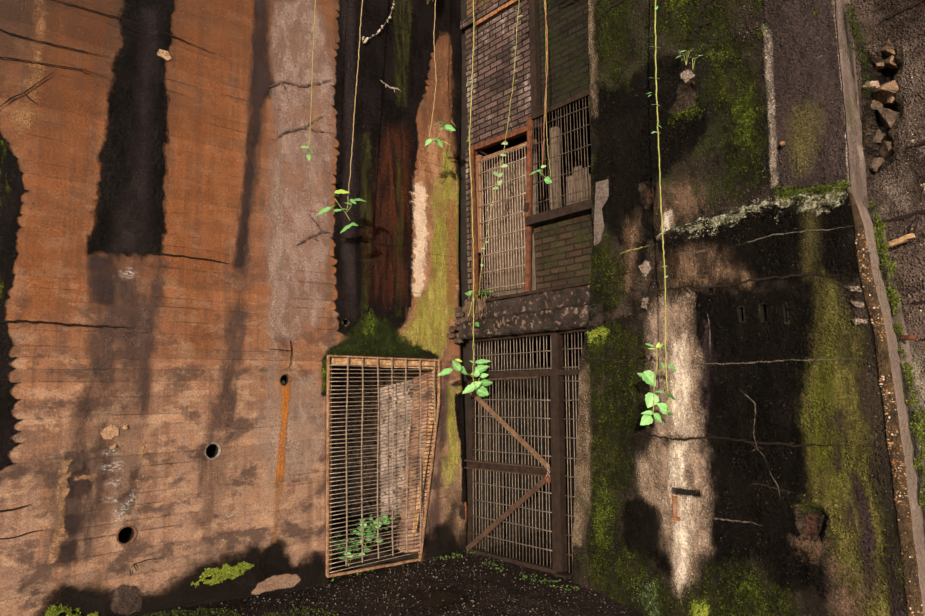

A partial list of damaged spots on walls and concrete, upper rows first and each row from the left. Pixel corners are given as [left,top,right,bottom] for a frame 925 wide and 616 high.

spalling [861,38,925,178]
water stain [236,0,462,357]
water stain [883,182,909,211]
water stain [52,0,175,566]
water stain [208,303,245,444]
corrosion [276,385,289,483]
water stain [572,373,591,544]
water stain [588,0,858,599]
crack [577,389,879,495]
crack [697,314,858,365]
spalling [791,496,832,558]
water stain [848,478,875,597]